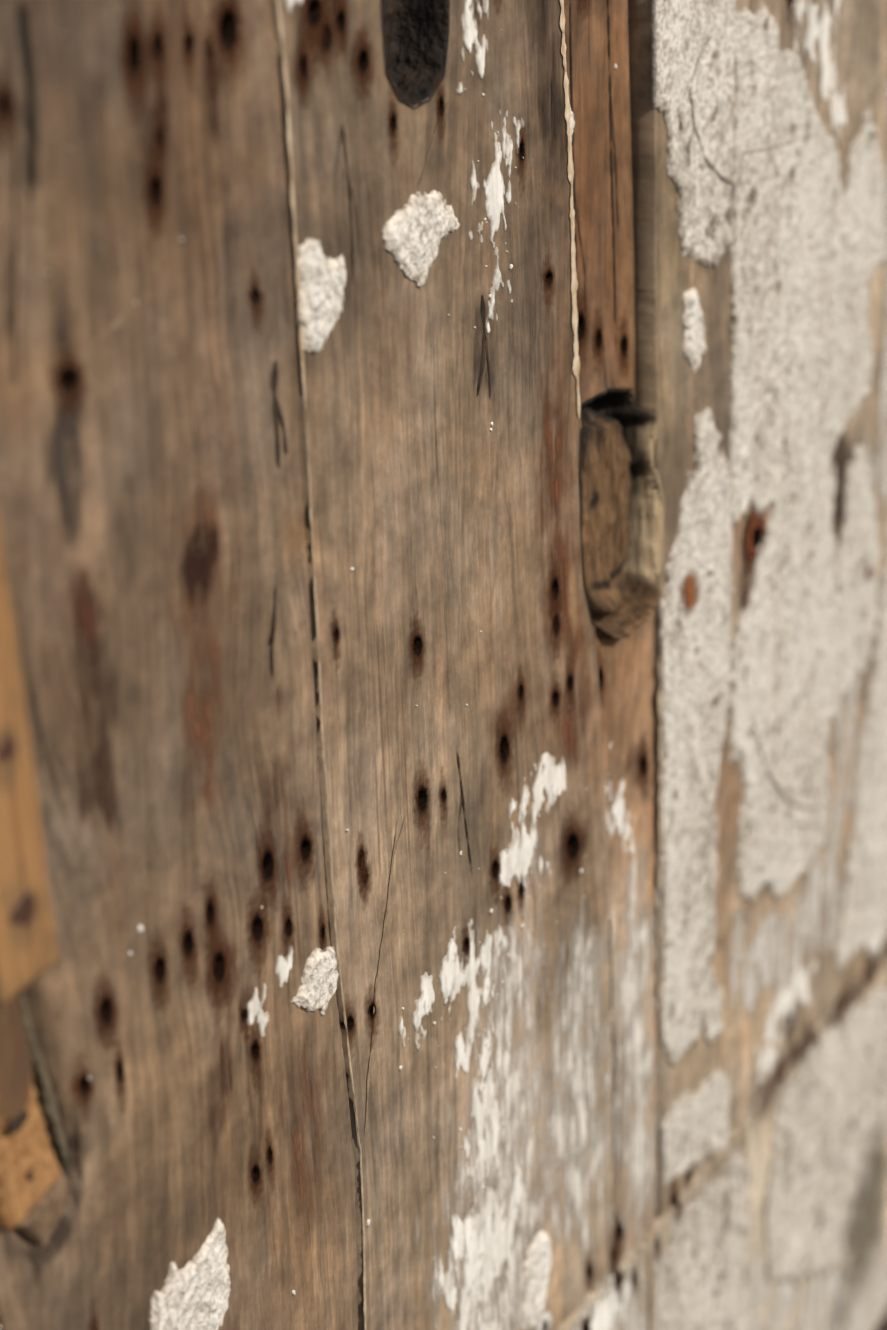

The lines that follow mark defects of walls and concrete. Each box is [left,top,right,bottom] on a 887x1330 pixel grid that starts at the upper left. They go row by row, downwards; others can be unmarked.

peeling [462,0,489,78]
peeling [382,190,473,288]
peeling [471,117,523,334]
rust [682,573,699,612]
rust [745,511,767,608]
peeling [573,0,887,1330]
peeling [499,752,566,889]
peeling [400,920,552,1330]